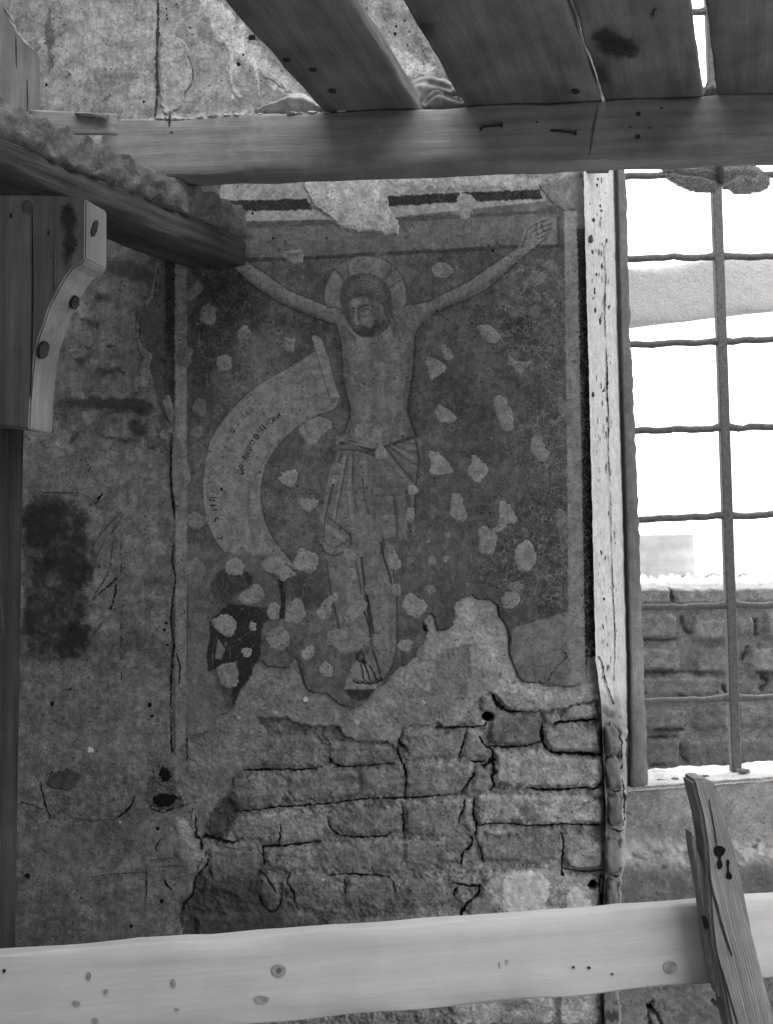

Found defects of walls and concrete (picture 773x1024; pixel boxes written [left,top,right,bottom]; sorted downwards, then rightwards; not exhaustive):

flaking render [425,344,454,380]
flaking render [434,405,457,423]
flaking render [493,395,514,431]
flaking render [429,451,454,475]
flaking render [468,455,488,483]
flaking render [382,485,468,523]
flaking render [478,501,517,555]
water stain [21,493,96,661]
crack [203,253,626,915]
crack [169,545,189,773]
flaking render [21,532,622,935]
flaking render [262,993,604,1024]